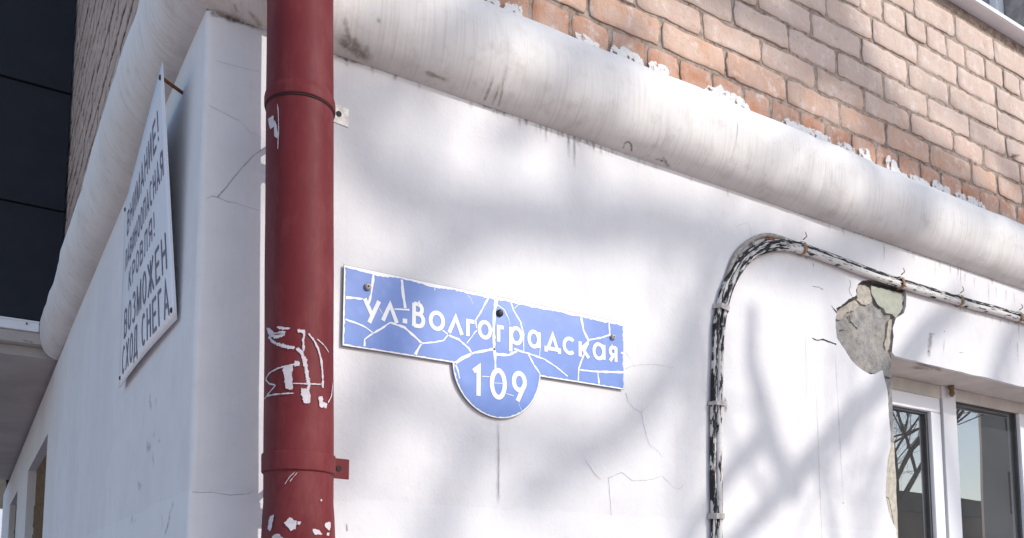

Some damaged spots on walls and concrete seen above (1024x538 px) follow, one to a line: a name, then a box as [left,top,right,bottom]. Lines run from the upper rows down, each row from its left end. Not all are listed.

crack [207,105,264,210]
peeling [704,84,751,111]
peeling [781,118,872,161]
peeling [886,155,986,209]
spalling [812,280,904,378]
crack [585,394,680,515]
spalling [886,442,898,538]